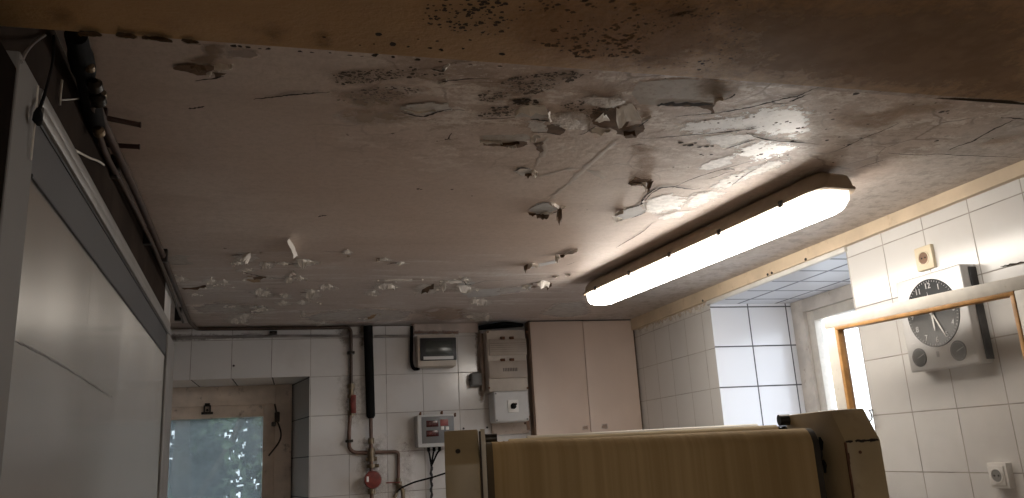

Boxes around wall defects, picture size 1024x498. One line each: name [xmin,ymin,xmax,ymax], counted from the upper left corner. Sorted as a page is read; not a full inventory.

damp [116,32,273,63]
damp [333,0,1024,117]
crack [678,88,816,117]
peeling [480,103,566,178]
peeling [580,79,814,246]
crack [836,117,1022,166]
peeling [528,183,569,226]
peeling [168,239,340,305]
peeling [518,249,578,290]
peeling [364,277,501,322]